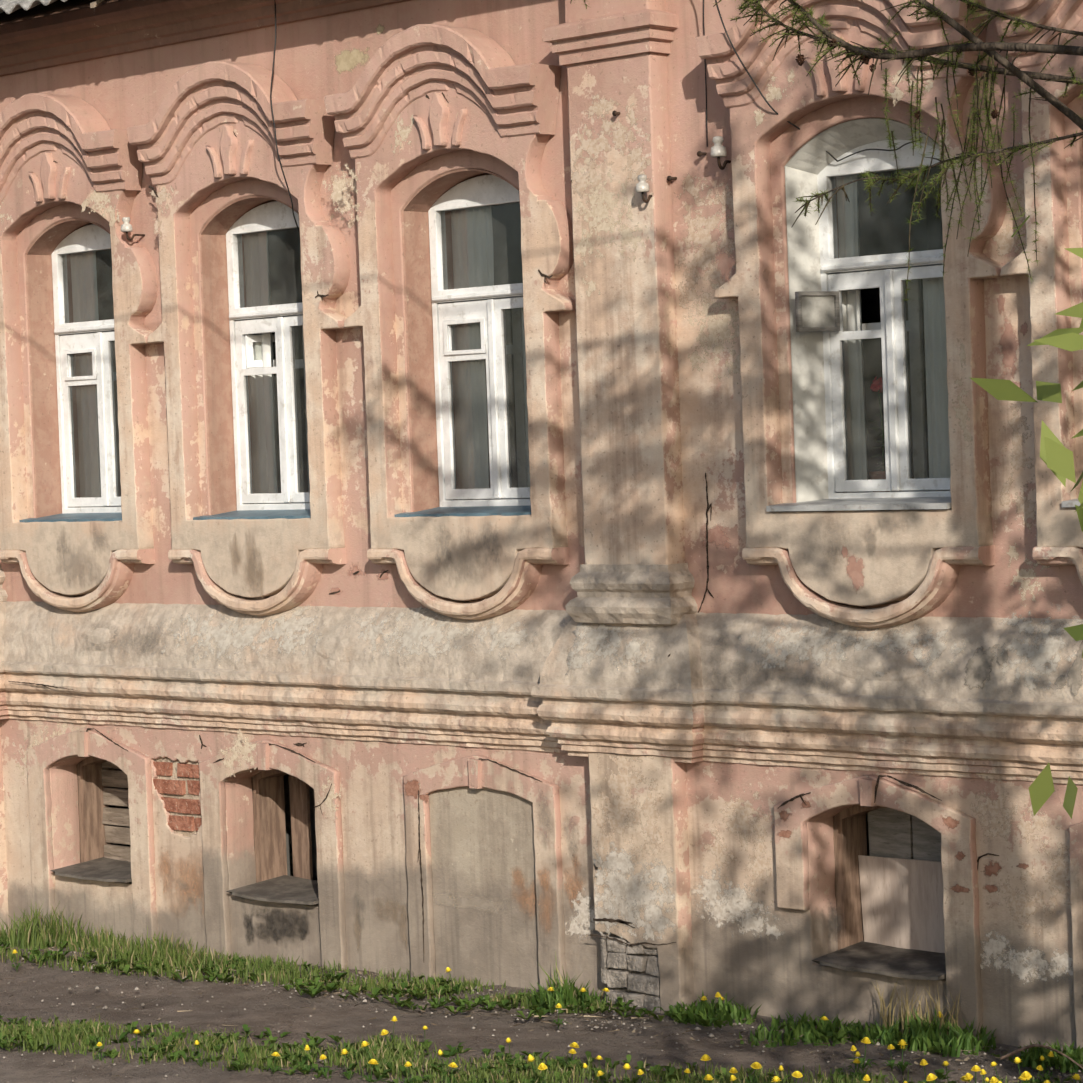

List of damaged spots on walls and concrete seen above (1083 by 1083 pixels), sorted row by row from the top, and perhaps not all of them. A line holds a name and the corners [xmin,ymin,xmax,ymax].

peeling [316,164,362,228]
peeling [570,94,652,297]
crack [698,473,714,613]
peeling [842,546,864,589]
crack [268,743,316,763]
spalling [153,757,202,837]
crack [778,792,811,809]
crack [874,775,942,803]
leakage [245,917,253,942]
leakage [299,916,308,937]
spalling [601,932,661,1013]